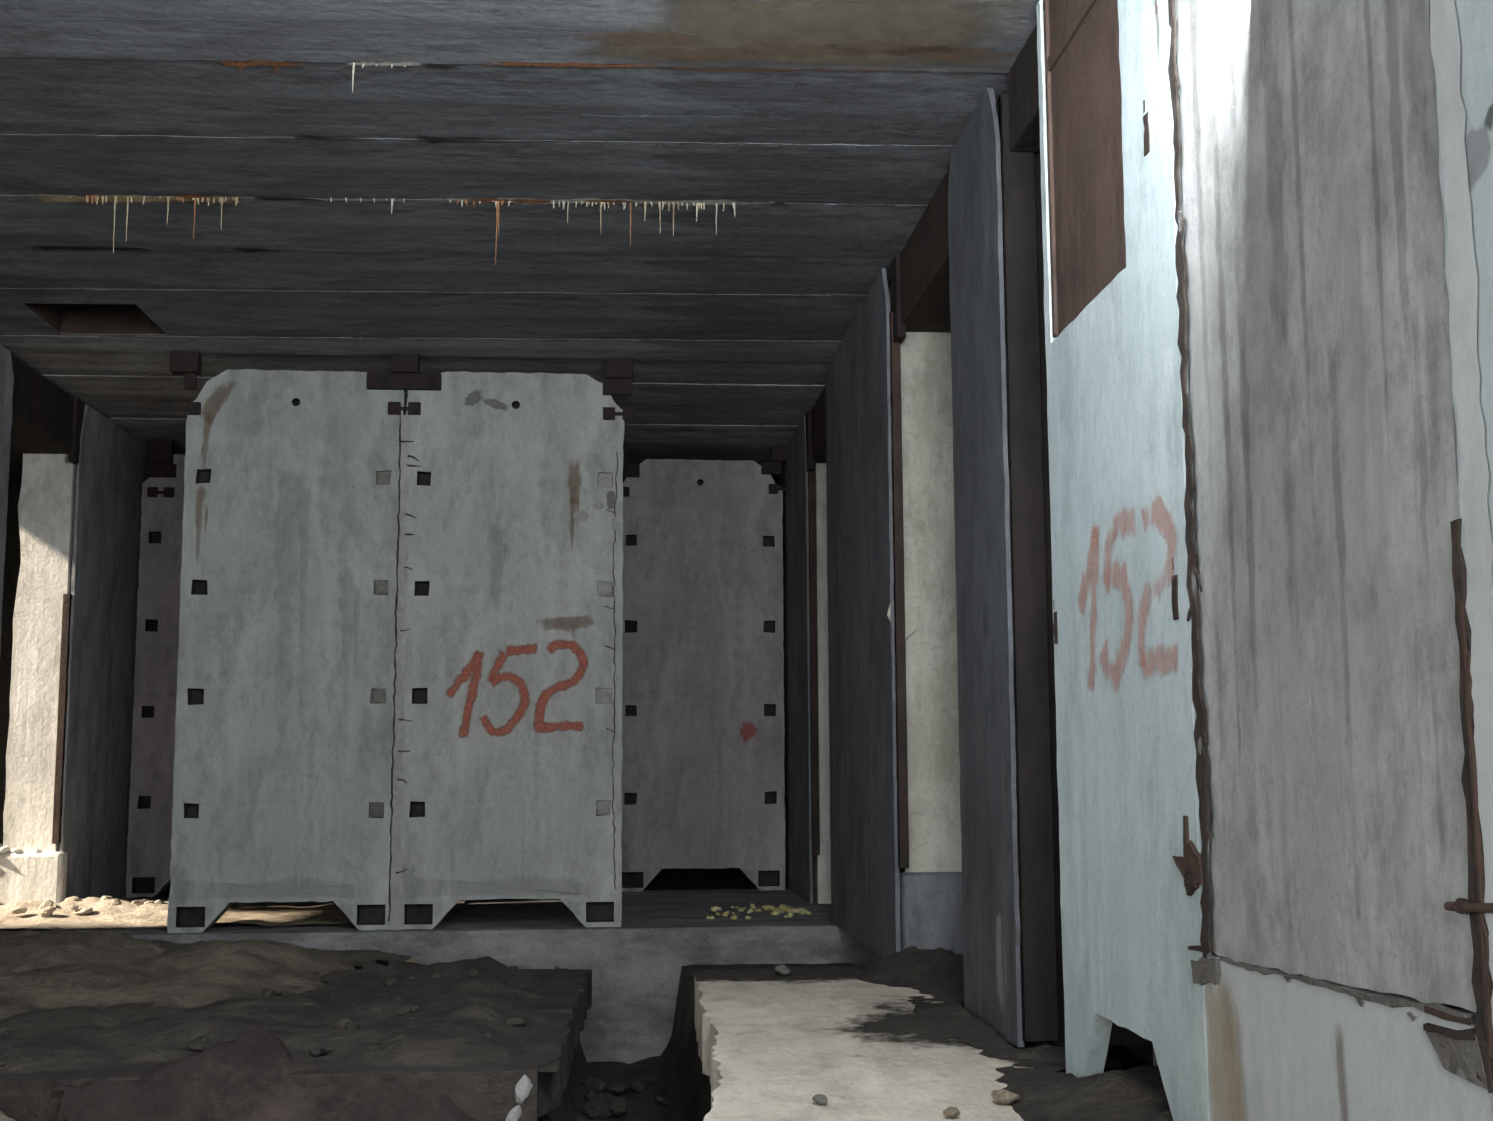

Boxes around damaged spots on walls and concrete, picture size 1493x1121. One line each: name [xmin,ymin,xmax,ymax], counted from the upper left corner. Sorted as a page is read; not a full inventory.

efflorescence [435,197,736,266]
spalling [1171,558,1179,620]
spalling [1188,946,1220,986]